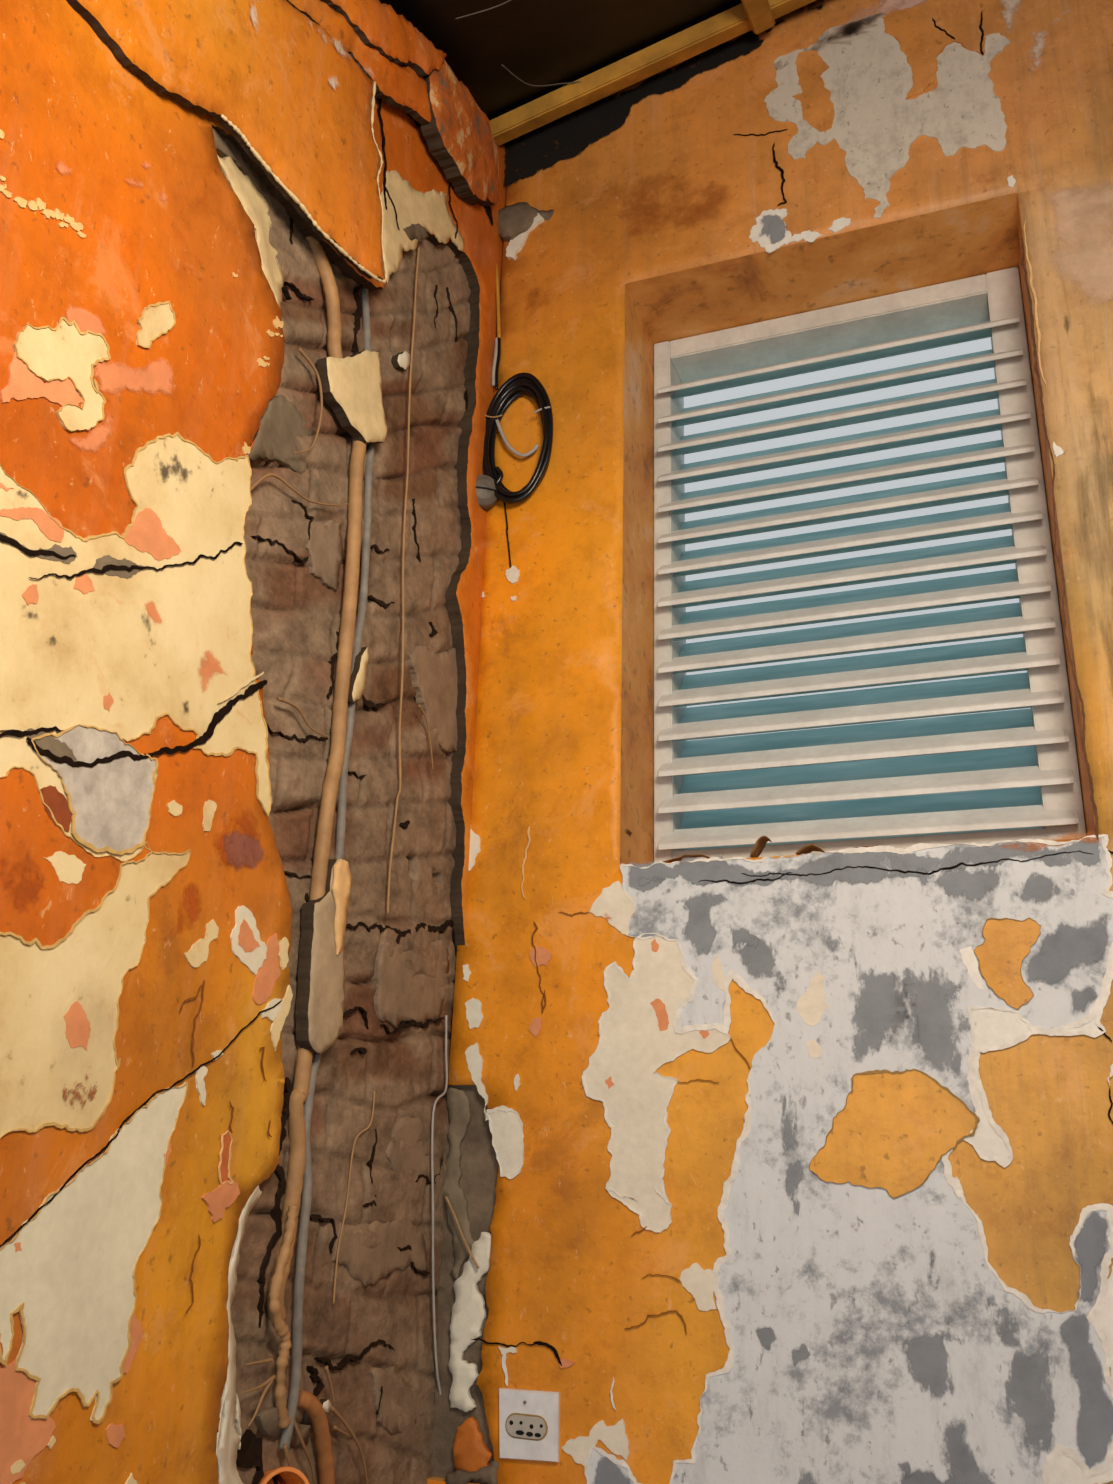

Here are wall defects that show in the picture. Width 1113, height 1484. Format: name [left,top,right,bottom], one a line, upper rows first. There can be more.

crack [733,129,788,206]
peeling [764,0,1021,219]
peeling [749,208,851,253]
crack [0,532,243,580]
crack [699,221,1113,884]
crack [0,672,268,768]
spalling [0,127,524,1484]
peeling [528,921,553,1037]
crack [0,980,282,1247]
peeling [582,834,1113,1484]
crack [625,1274,687,1334]
peeling [562,1418,642,1484]